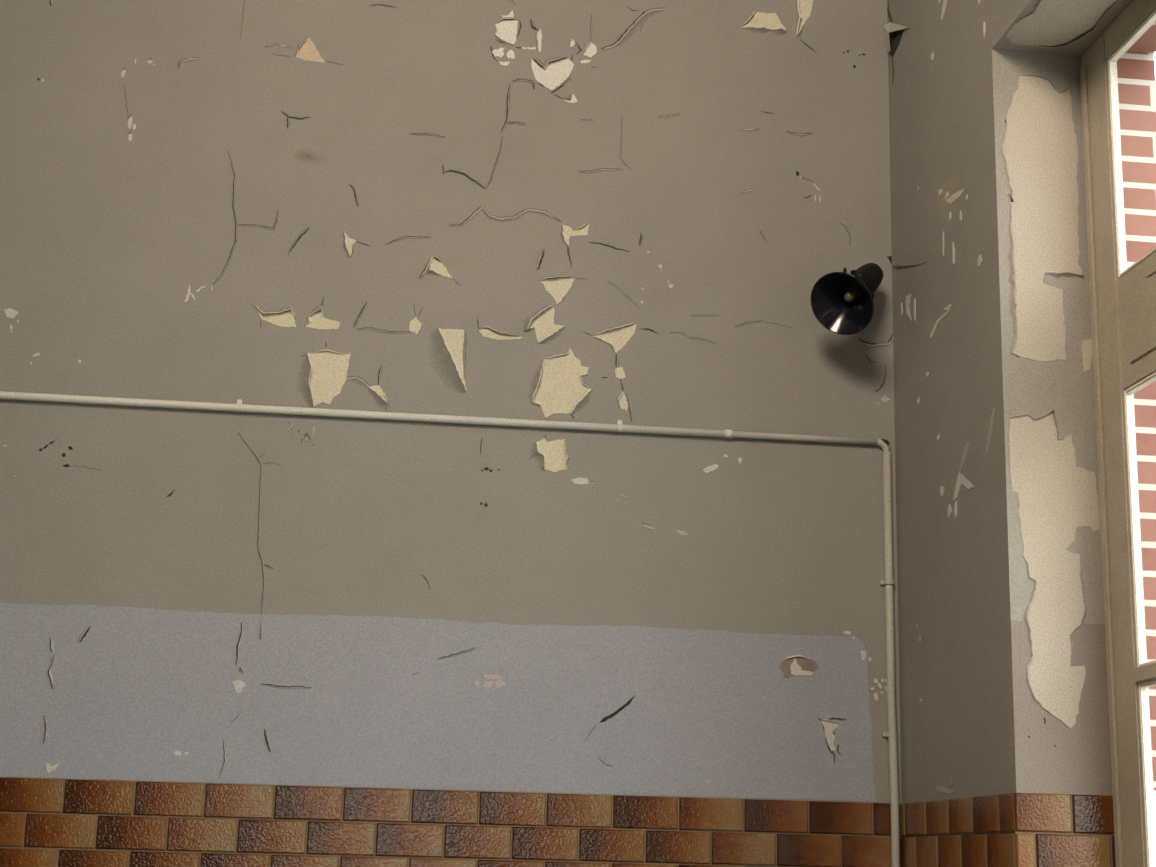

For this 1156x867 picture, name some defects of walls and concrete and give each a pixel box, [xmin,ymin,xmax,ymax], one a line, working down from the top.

crack [209,152,310,290]
crack [281,110,310,129]
crack [385,84,561,246]
peeling [490,0,598,103]
crack [589,231,644,252]
peeling [1000,73,1084,362]
peeling [1006,0,1120,48]
peeling [297,344,391,409]
peeling [356,222,593,420]
crack [607,281,788,345]
crack [219,431,312,777]
peeling [1009,408,1100,729]